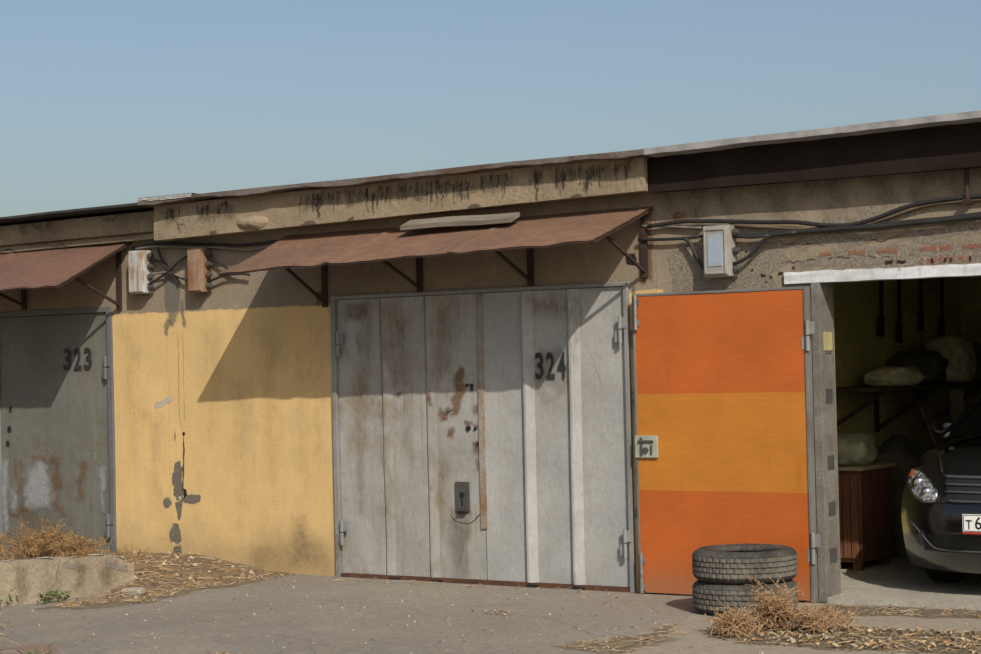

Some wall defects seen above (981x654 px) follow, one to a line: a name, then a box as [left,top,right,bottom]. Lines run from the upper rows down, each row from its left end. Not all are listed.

leakage [299,174,507,217]
leakage [555,165,627,191]
spalling [668,206,981,292]
rust [440,368,478,436]
spalling [163,461,201,554]